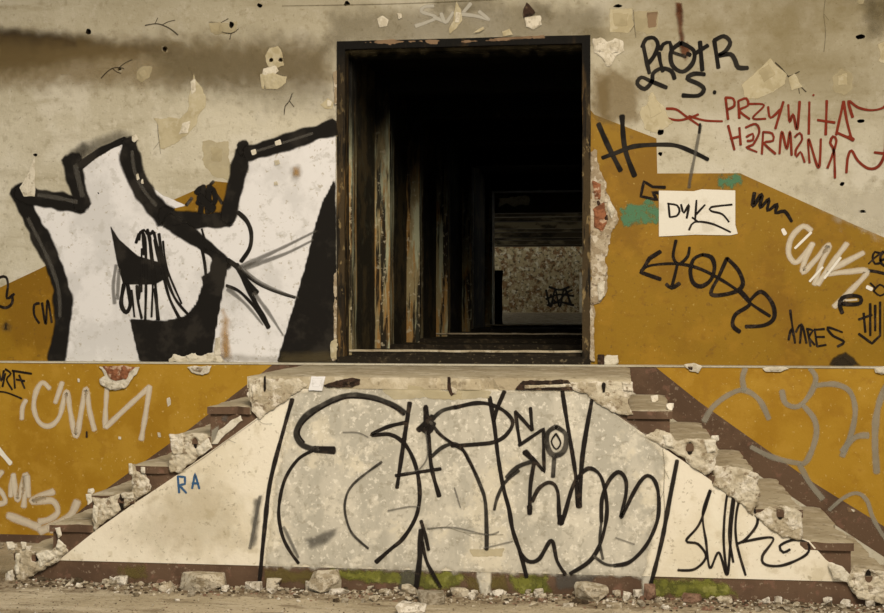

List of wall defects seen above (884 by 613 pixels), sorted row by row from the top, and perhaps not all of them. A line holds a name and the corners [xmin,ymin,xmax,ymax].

leakage [0,31,152,69]
flaking render [260,46,287,89]
peeling [155,75,206,149]
spalling [590,149,619,365]
spalling [99,365,140,390]
spalling [515,379,633,415]
spalling [157,416,242,473]
spalling [86,463,151,531]
spalling [644,429,803,540]
spalling [0,527,68,580]
spalling [828,562,884,605]